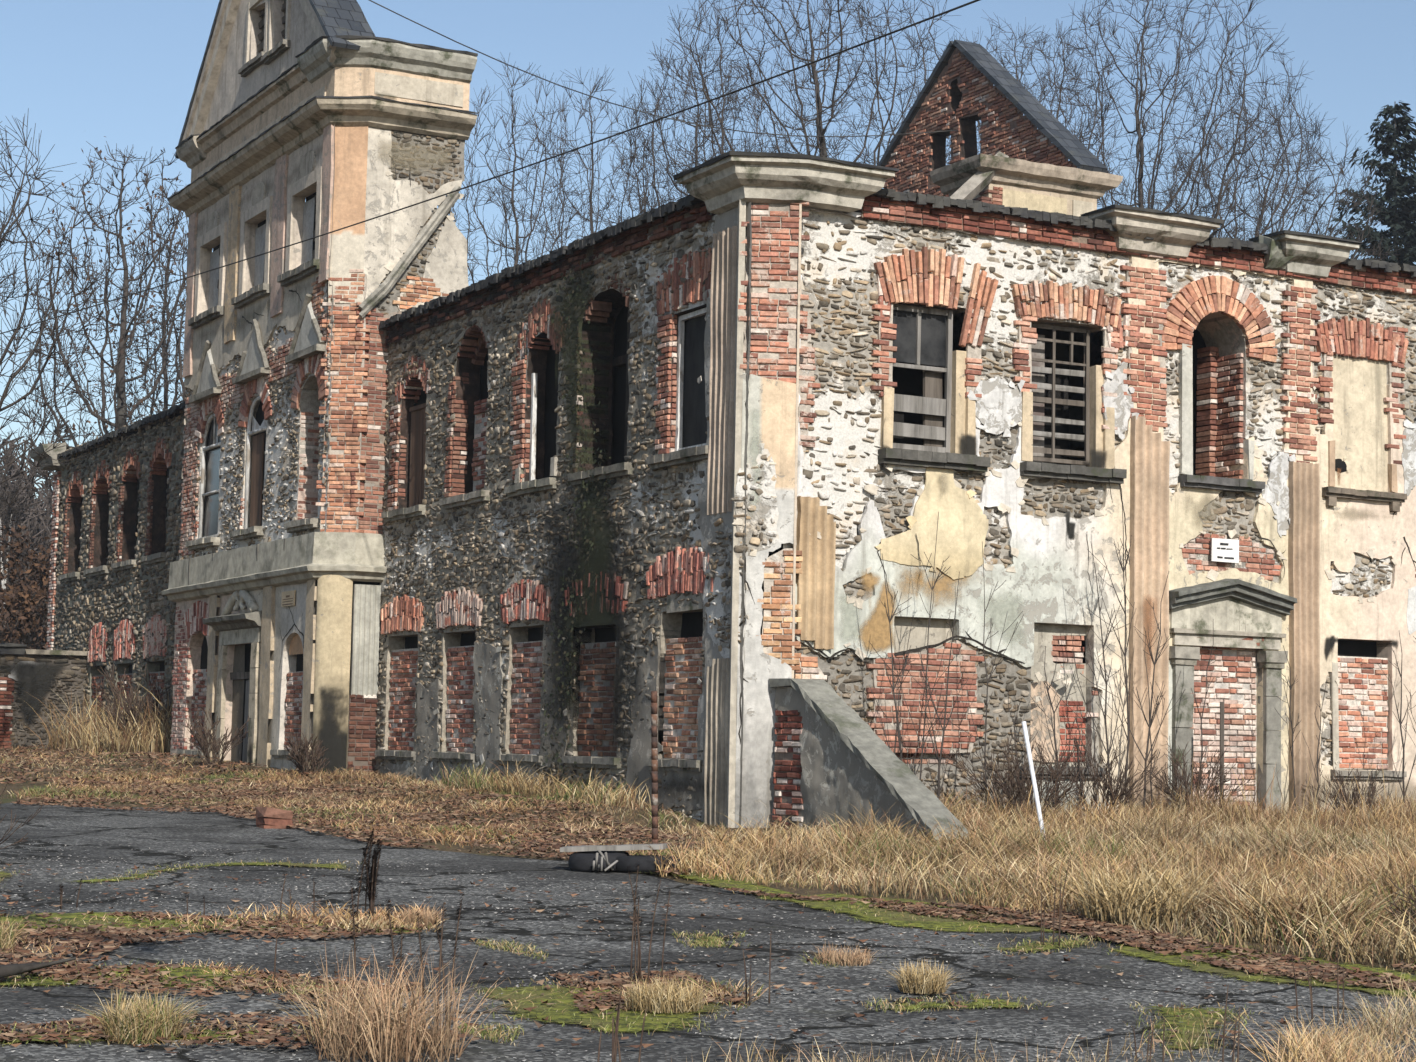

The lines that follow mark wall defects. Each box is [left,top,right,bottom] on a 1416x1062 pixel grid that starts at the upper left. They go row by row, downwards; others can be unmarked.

spalling [178,130,465,560]
peeling [626,632,706,811]
spalling [695,289,1106,832]
spalling [738,202,1416,609]
spalling [1320,672,1340,766]